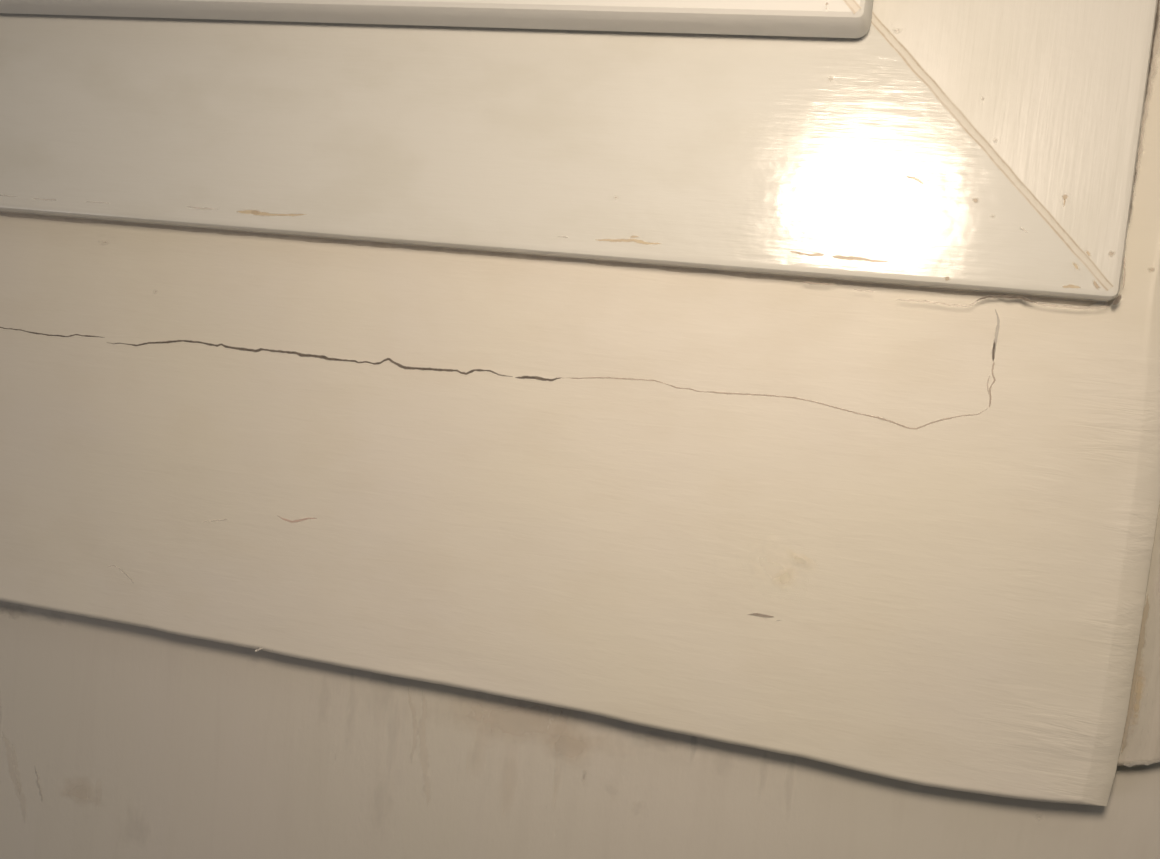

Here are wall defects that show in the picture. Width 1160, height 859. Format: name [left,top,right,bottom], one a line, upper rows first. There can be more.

crack [0,295,1035,429]